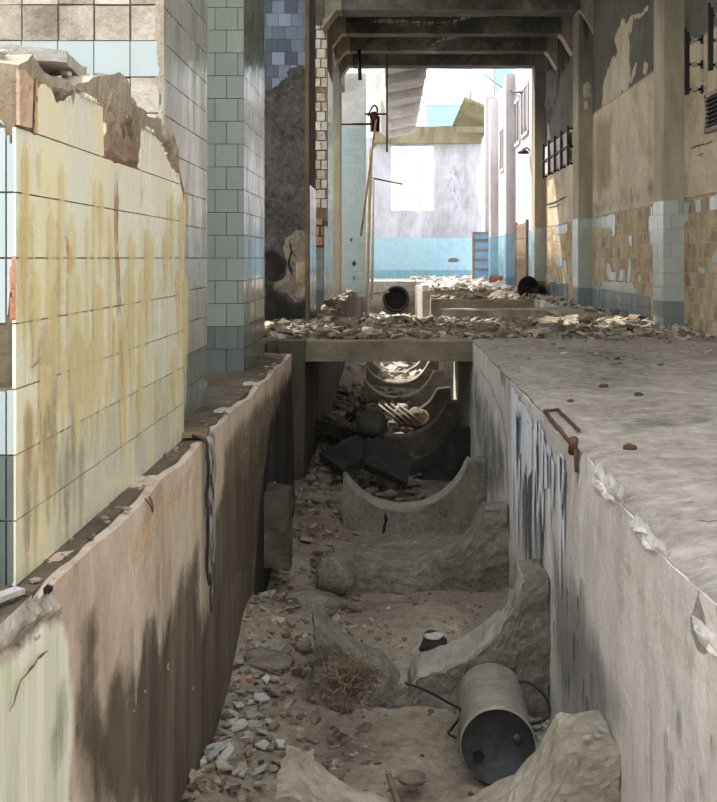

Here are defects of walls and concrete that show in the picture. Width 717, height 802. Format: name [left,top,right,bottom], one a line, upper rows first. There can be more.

spalling [30,76,39,135]
spalling [52,87,80,103]
spalling [102,88,141,169]
spalling [155,0,179,173]
peeling [602,5,648,107]
spalling [274,230,305,302]
crack [288,240,297,275]
crack [381,512,389,534]
water stain [480,370,606,716]
water stain [77,373,292,802]
spalling [691,615,717,661]
crack [9,650,48,711]